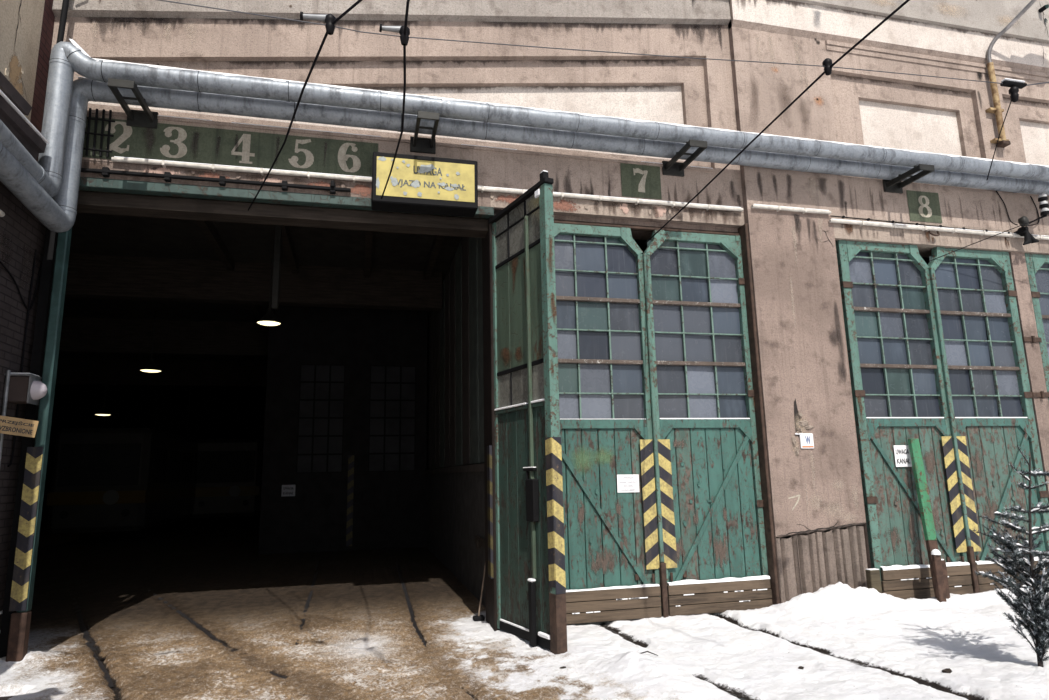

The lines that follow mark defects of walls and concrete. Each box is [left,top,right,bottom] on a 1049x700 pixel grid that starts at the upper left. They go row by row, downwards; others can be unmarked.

leakage [758,173,791,196]
leakage [794,214,817,241]